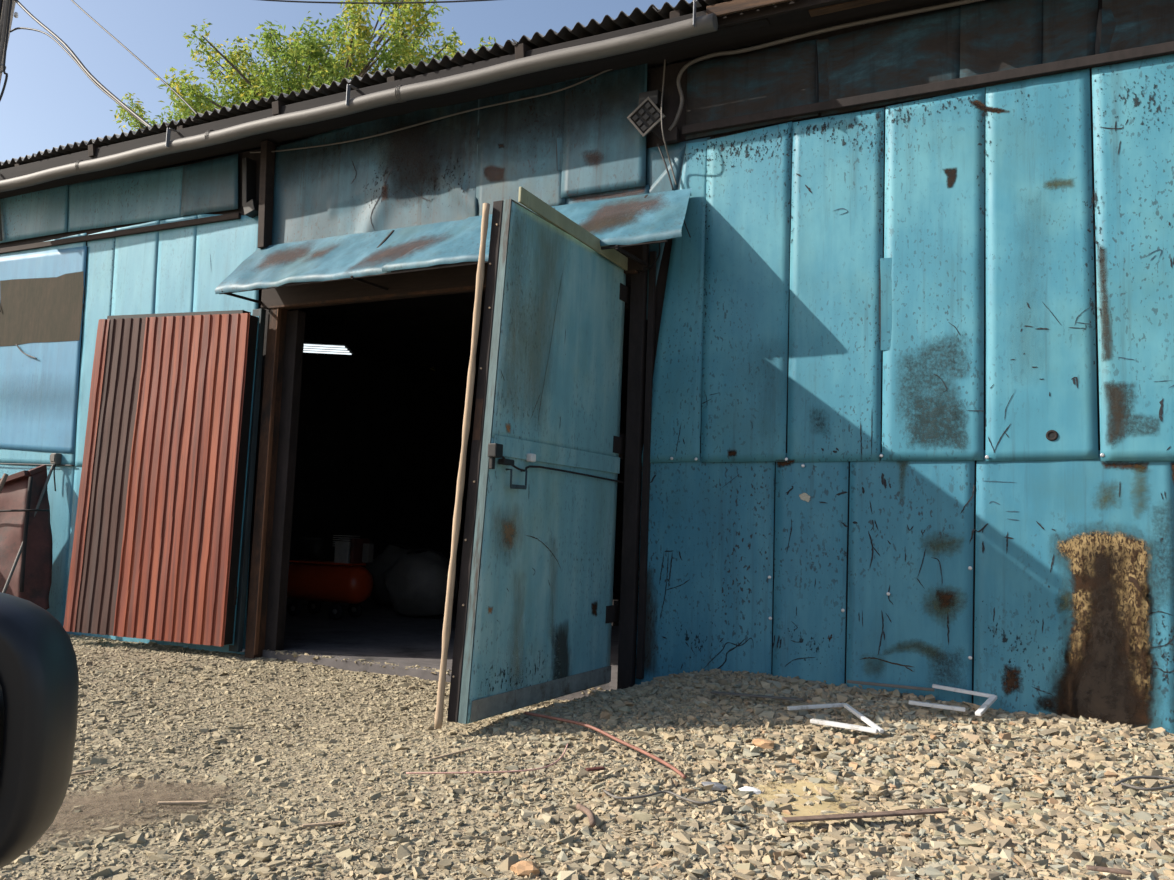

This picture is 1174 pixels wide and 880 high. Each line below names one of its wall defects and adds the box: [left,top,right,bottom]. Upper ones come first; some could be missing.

corrosion [928,592,958,617]
corrosion [1037,532,1152,728]
corrosion [1002,667,1021,694]